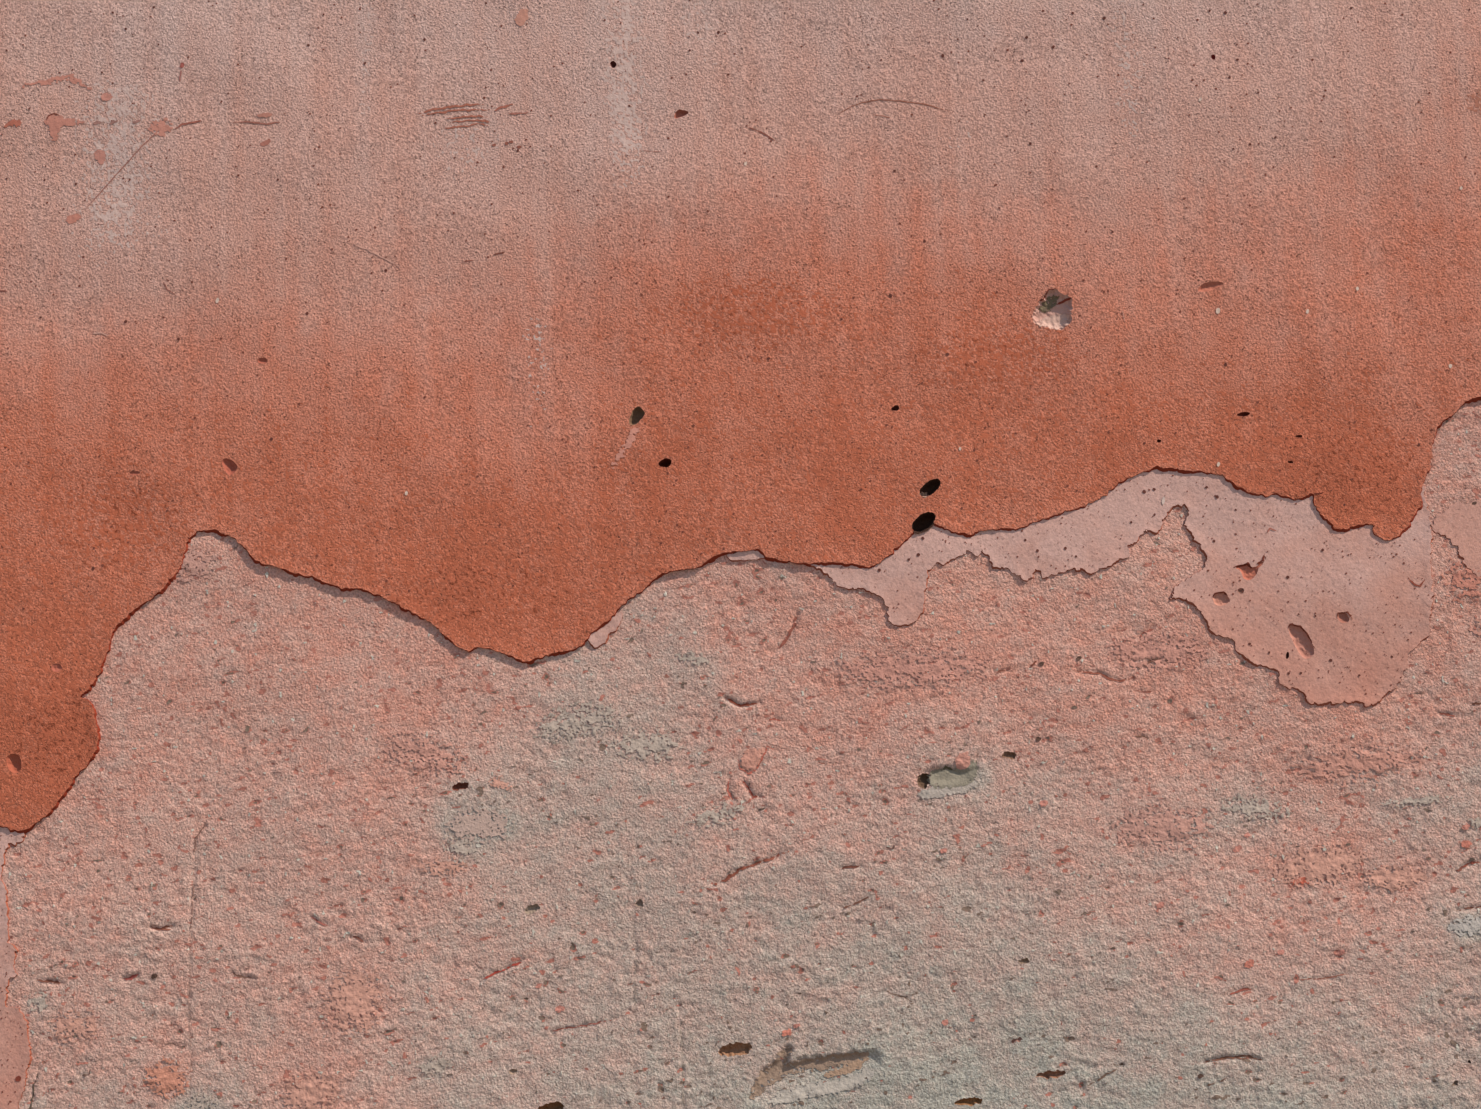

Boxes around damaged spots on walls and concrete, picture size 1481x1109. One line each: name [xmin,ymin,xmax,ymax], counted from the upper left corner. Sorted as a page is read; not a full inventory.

spalling [1032,288,1073,330]
flaking render [0,397,1481,1109]